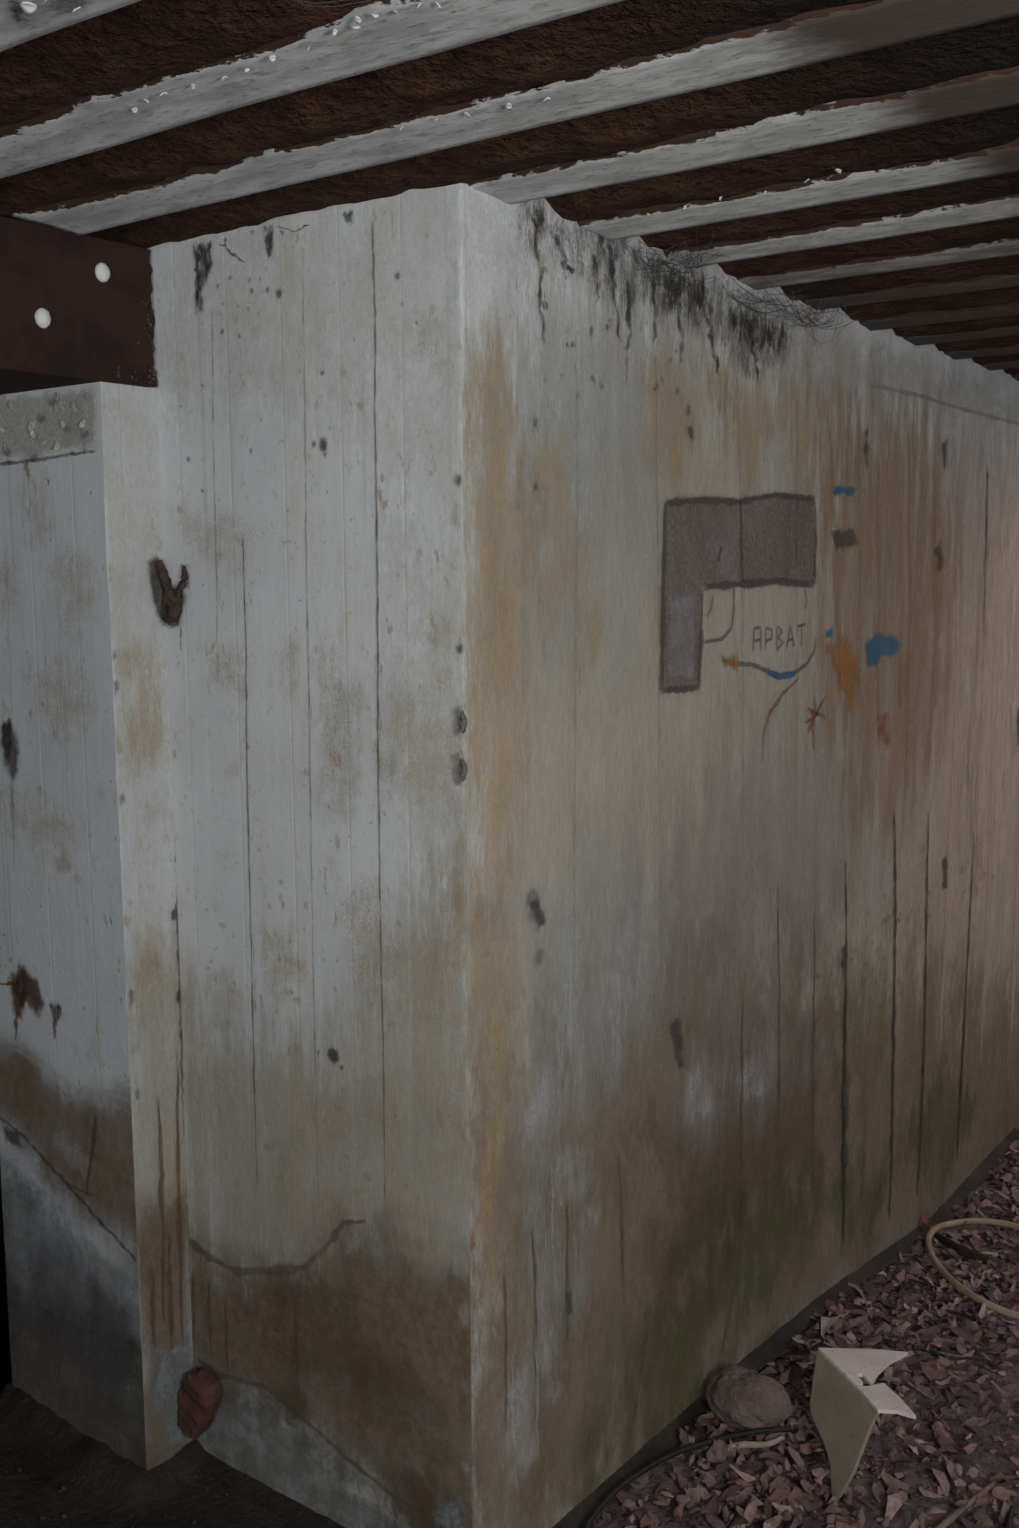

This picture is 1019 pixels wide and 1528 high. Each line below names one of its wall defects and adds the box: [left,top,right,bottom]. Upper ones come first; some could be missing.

damp [193,241,244,310]
damp [264,225,308,256]
damp [527,210,594,274]
damp [592,235,641,347]
damp [638,264,788,384]
damp [0,314,1019,1528]
rust [0,965,62,1039]